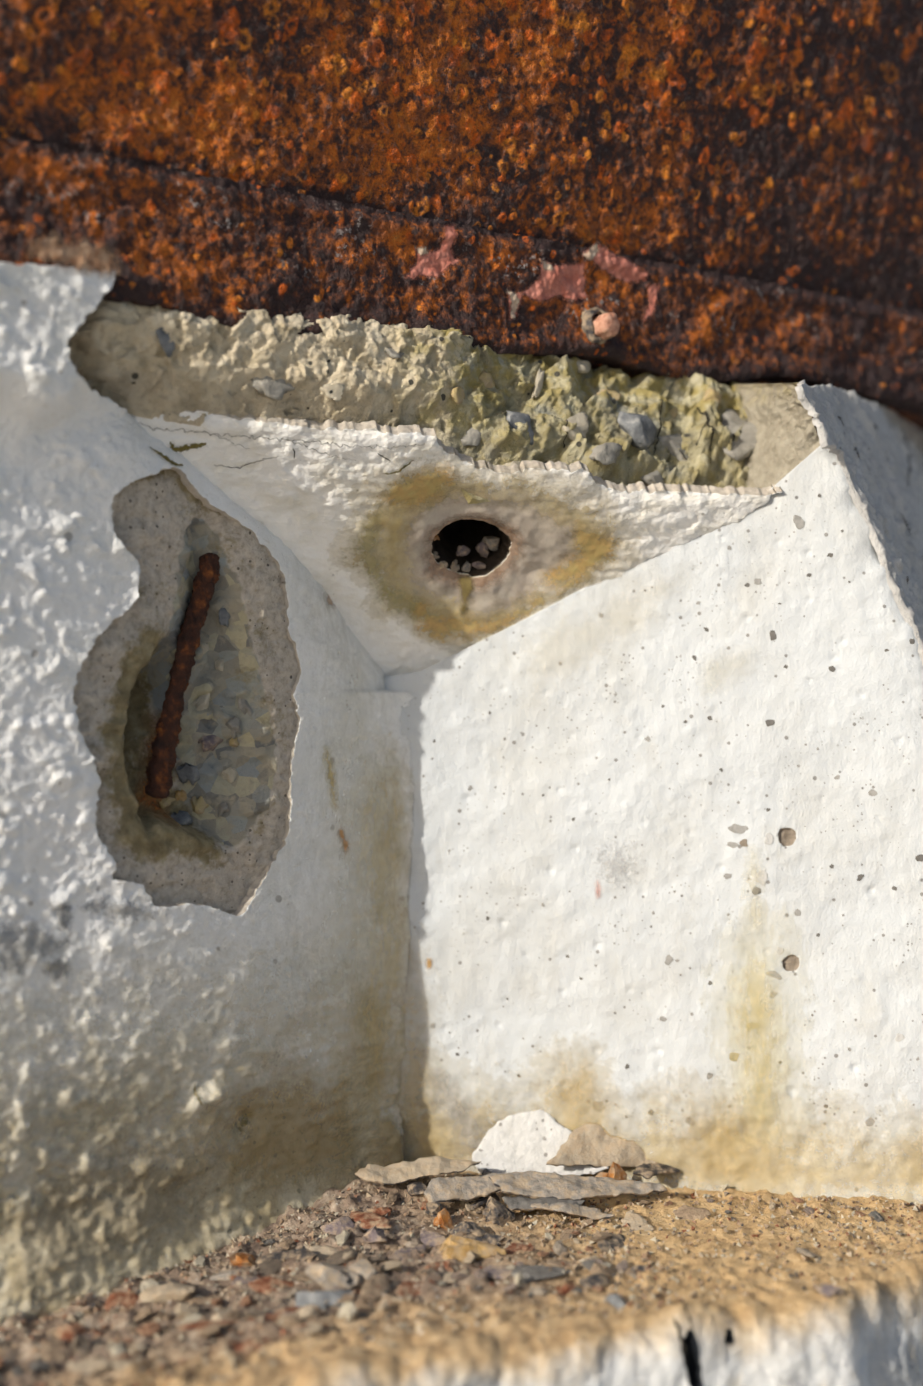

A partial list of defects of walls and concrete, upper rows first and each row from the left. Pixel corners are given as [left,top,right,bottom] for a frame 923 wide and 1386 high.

rust [29,237,121,275]
spalling [68,300,820,488]
spalling [0,469,299,979]
peeling [355,1101,657,1211]
damp [552,1088,581,1132]
damp [584,1073,923,1203]
crack [670,1300,734,1386]